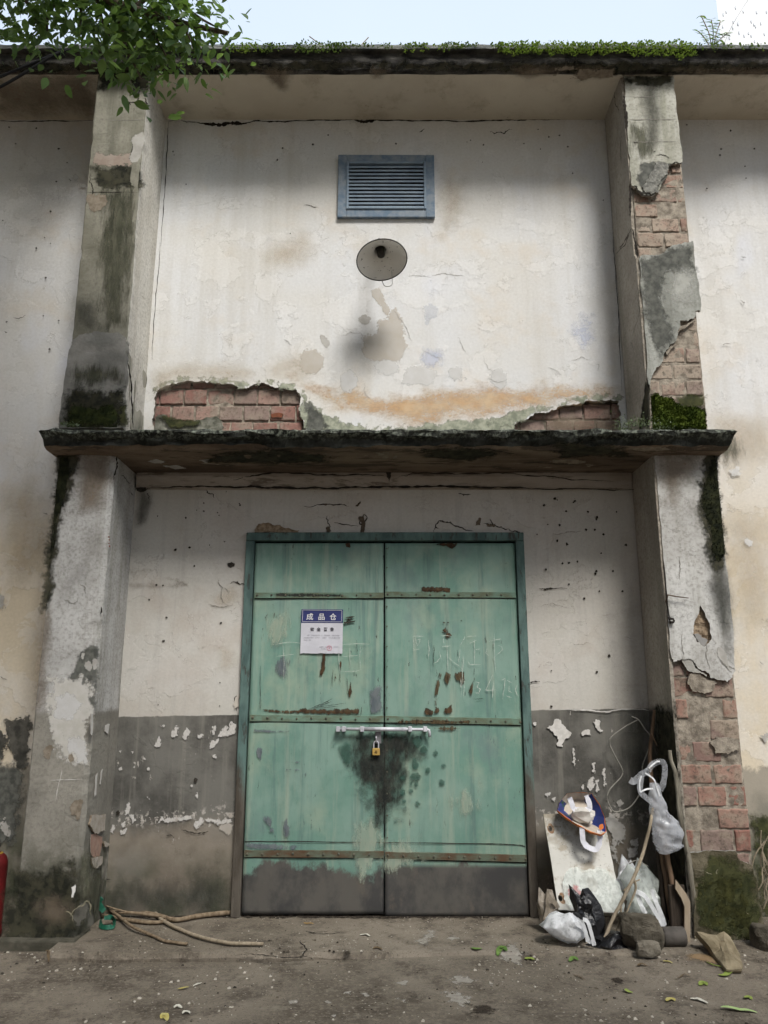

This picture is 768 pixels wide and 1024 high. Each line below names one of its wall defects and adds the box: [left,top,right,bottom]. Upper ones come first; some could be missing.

leakage [89,165,145,328]
crack [152,120,526,345]
flaking render [153,382,306,431]
leakage [153,375,623,431]
flaking render [514,404,620,431]
flaking render [693,608,710,647]
rust [264,682,359,715]
rust [398,671,473,731]
mould [0,715,34,846]
leakage [400,746,445,806]
peeling [533,719,603,766]
flaking render [673,659,752,865]